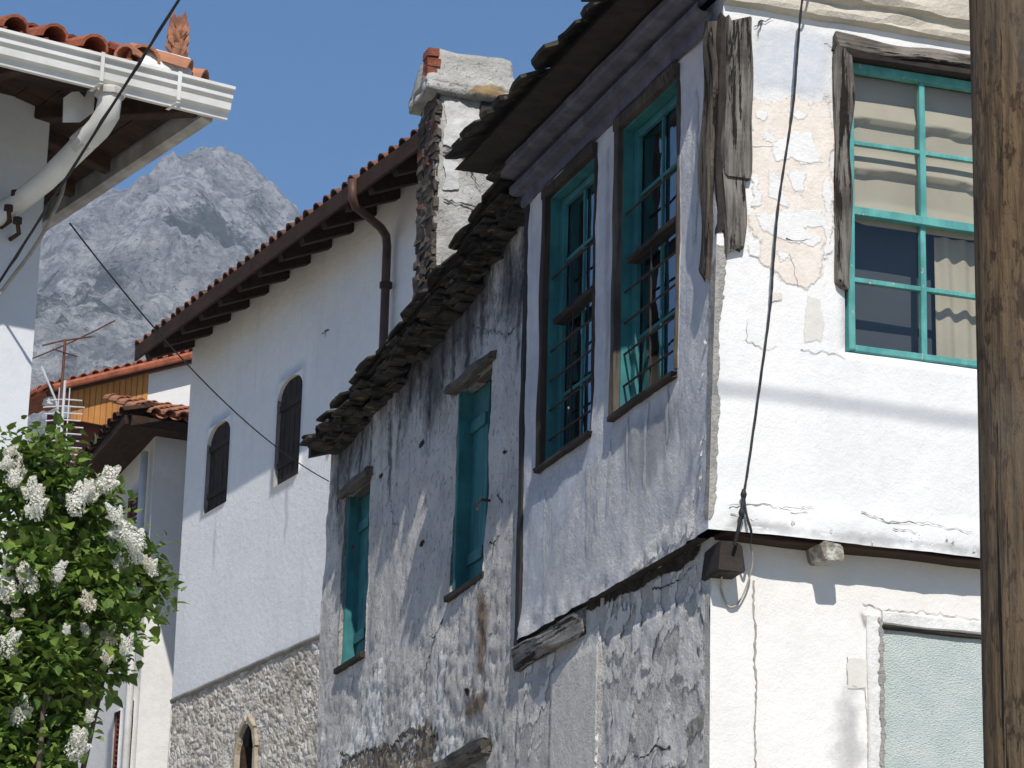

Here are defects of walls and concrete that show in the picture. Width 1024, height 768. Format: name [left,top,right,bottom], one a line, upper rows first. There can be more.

flaking render [748,93,835,342]
water stain [331,232,524,532]
flaking render [584,244,727,768]